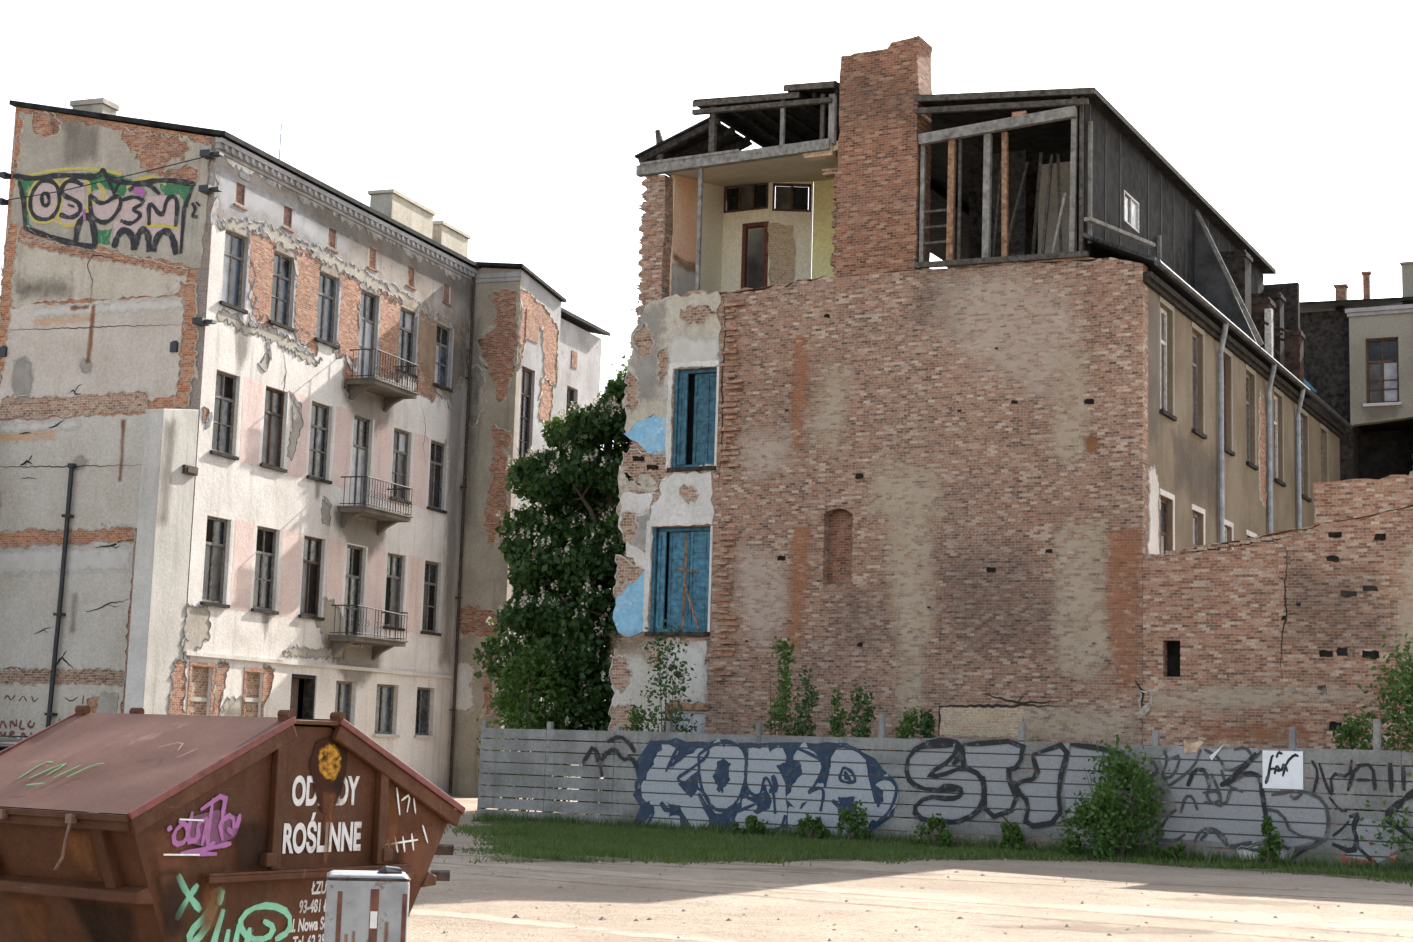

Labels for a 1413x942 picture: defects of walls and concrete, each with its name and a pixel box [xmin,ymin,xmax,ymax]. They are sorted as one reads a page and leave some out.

flaking render [12,111,63,170]
flaking render [0,218,213,430]
flaking render [120,127,559,548]
flaking render [622,321,671,415]
flaking render [0,523,136,550]
spalling [613,448,717,598]
flaking render [0,666,126,713]
flaking render [167,602,211,715]
flaking render [212,596,345,716]
flaking render [456,603,502,718]
flaking render [608,654,638,731]
crack [1277,550,1298,679]